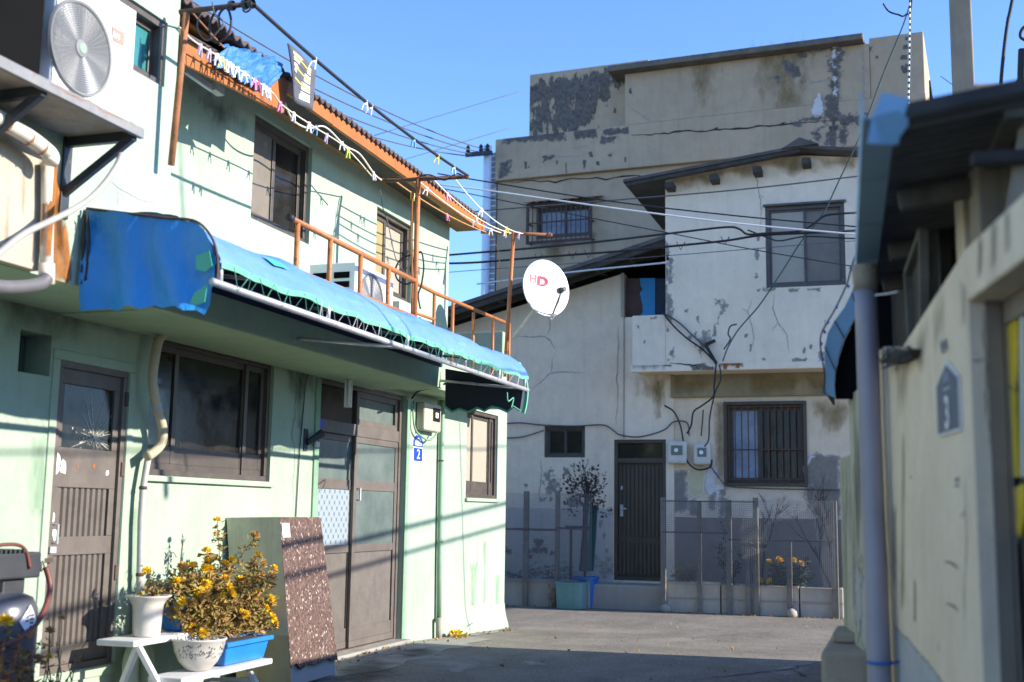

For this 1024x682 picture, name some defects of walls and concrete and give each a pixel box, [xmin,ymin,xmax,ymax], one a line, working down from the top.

peeling [501,67,632,168]
crack [631,108,828,136]
peeling [774,46,868,147]
peeling [497,159,530,179]
corrosion [40,166,71,281]
crack [519,317,581,389]
crack [613,338,621,425]
peeling [650,241,729,370]
crack [742,293,789,351]